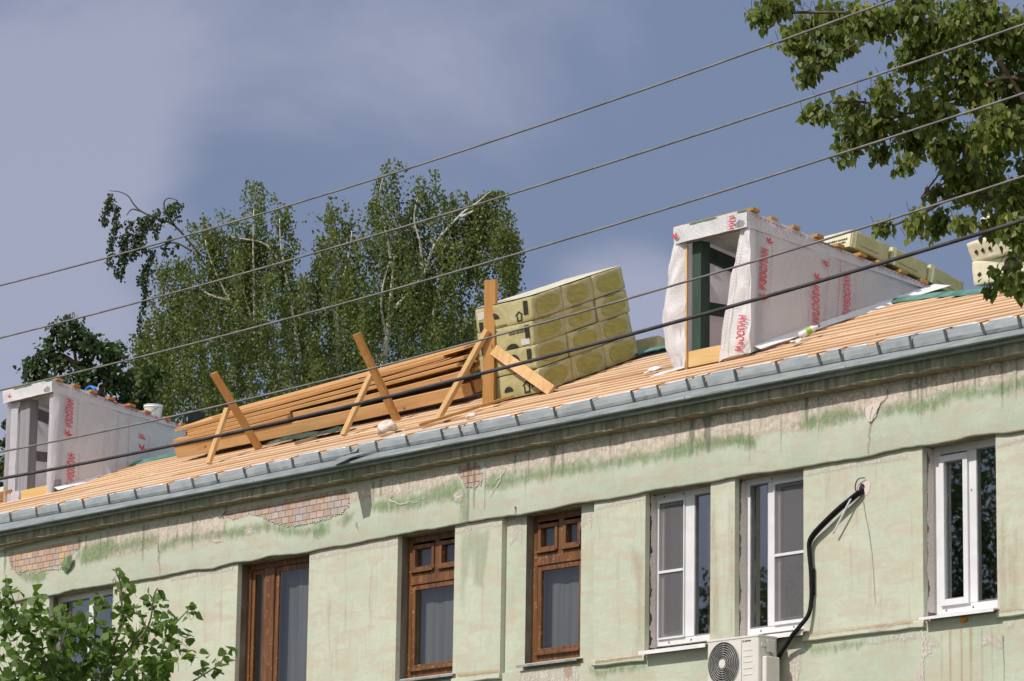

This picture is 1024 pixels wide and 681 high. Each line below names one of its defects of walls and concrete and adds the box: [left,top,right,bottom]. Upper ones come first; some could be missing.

water stain [805,398,856,429]
water stain [660,418,753,457]
peeling [0,358,1024,575]
water stain [474,448,647,504]
water stain [374,482,468,515]
water stain [81,525,192,562]